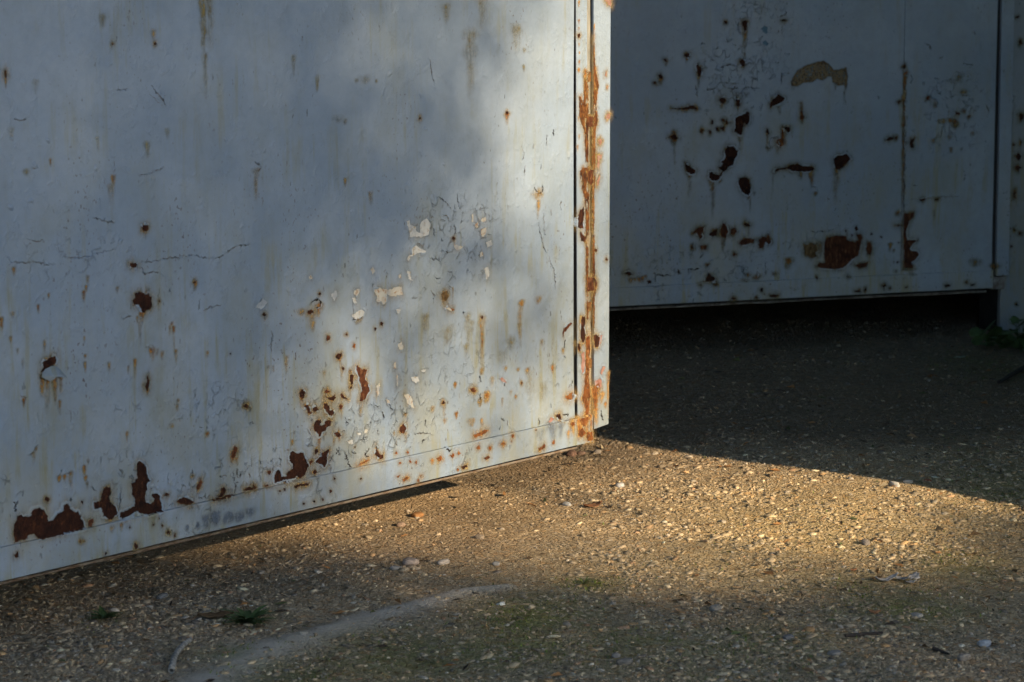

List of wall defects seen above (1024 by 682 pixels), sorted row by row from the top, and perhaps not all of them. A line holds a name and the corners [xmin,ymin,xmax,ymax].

rust [684,95,752,207]
rust [555,34,611,443]
rust [803,211,920,280]
rust [132,290,161,322]
rust [40,341,59,372]
rust [209,332,371,505]
rust [12,459,203,558]